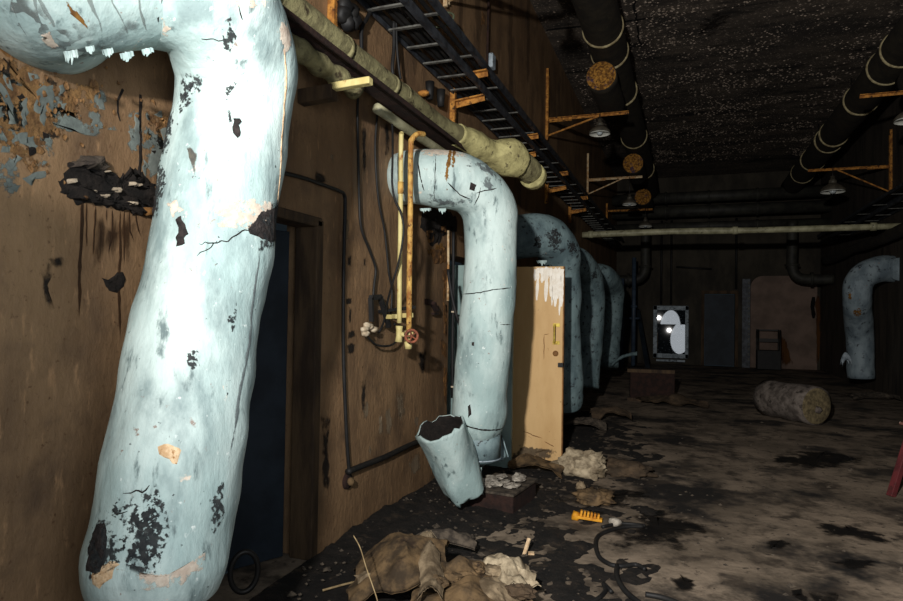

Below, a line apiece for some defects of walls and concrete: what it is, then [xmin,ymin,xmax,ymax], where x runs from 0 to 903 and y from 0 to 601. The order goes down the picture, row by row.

corrosion [67,2,87,27]
peeling [41,32,58,48]
peeling [0,48,168,216]
corrosion [445,150,456,190]
peeling [214,199,273,228]
crack [197,229,251,256]
flaking render [91,561,120,589]
peeling [139,553,205,590]